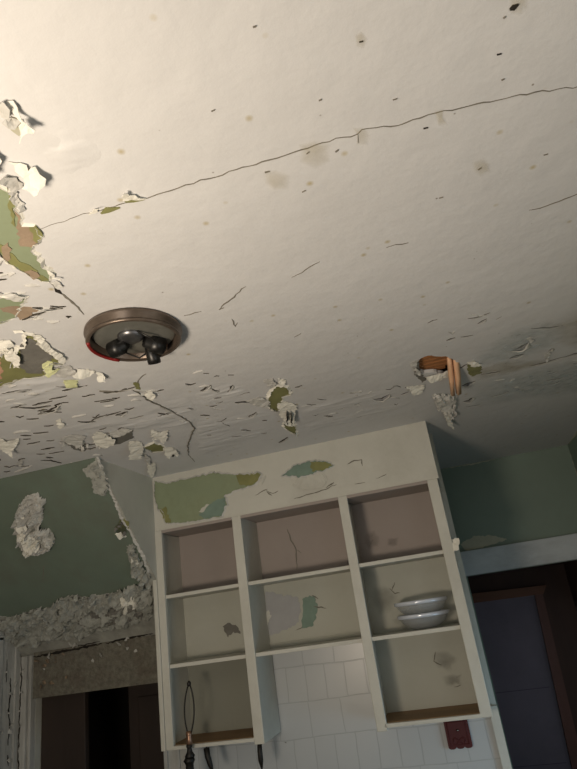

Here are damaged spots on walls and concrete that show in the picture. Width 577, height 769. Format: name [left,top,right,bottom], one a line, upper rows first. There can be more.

peeling [0,100,35,144]
crack [41,87,577,229]
peeling [0,159,61,283]
peeling [0,293,106,388]
crack [99,374,195,462]
peeling [246,378,299,437]
peeling [406,359,448,396]
peeling [432,393,457,430]
peeling [467,361,483,377]
peeling [281,459,335,499]
peeling [0,419,278,649]
crack [0,633,153,769]